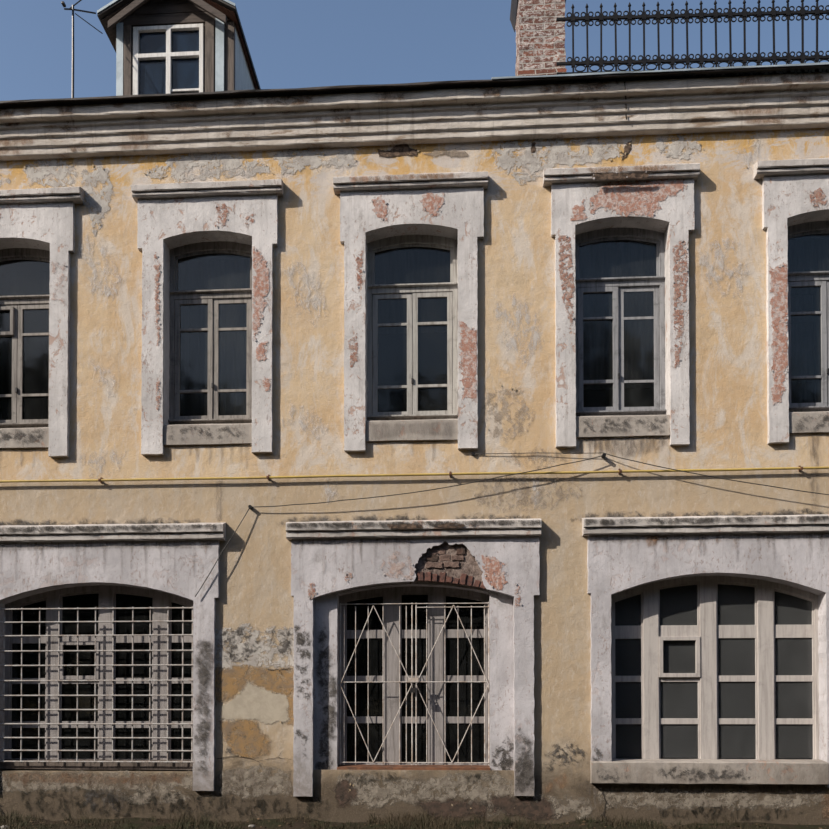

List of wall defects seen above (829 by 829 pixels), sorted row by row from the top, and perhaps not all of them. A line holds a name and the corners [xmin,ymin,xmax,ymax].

peeling [23,158,121,296]
peeling [144,149,358,182]
peeling [490,137,632,185]
peeling [570,171,688,221]
peeling [459,321,529,437]
peeling [558,235,575,323]
peeling [672,240,688,368]
peeling [769,262,788,405]
flaking render [380,542,522,607]
peeling [215,665,294,758]
water stain [194,623,337,770]
water stain [0,765,327,818]